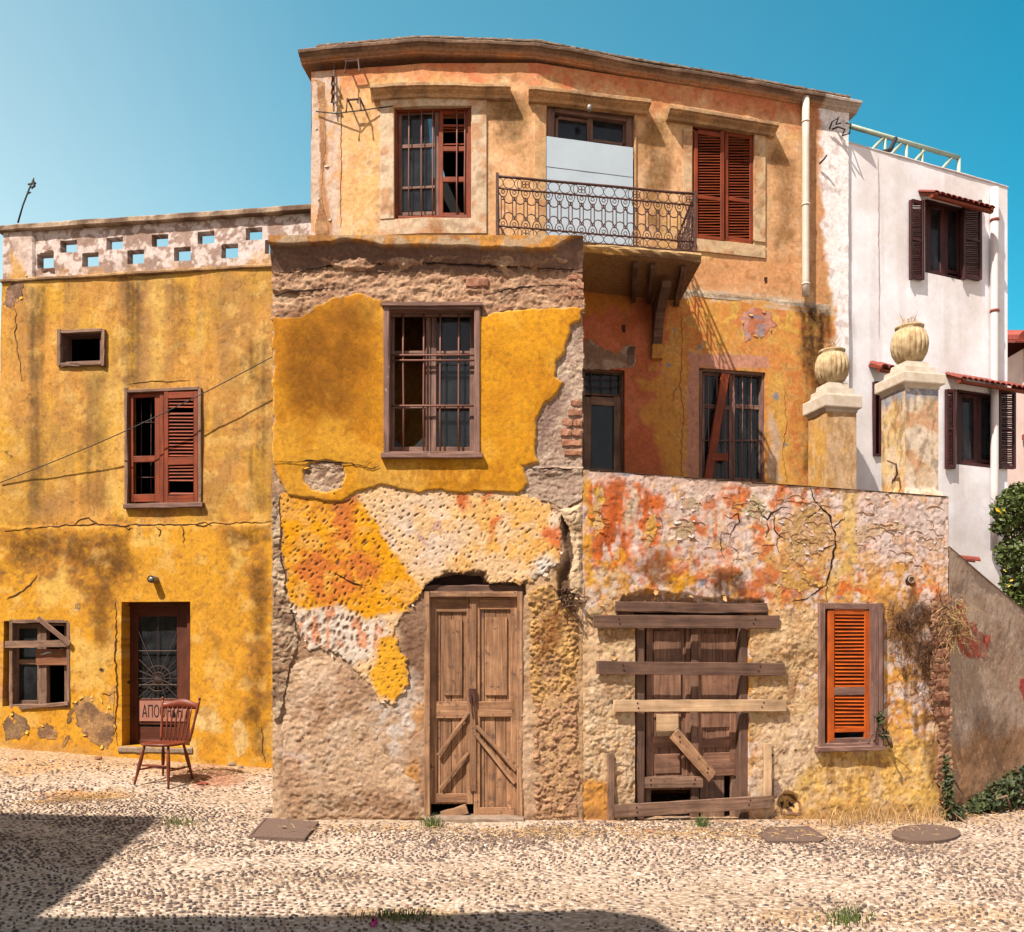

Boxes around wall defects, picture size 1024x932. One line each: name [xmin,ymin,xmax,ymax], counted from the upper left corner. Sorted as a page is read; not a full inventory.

crack [12,298,22,378]
peeling [741,306,777,342]
leakage [797,305,827,389]
crack [8,517,269,543]
spalling [271,254,637,720]
peeling [640,494,840,592]
crack [720,387,845,601]
peeling [854,493,948,567]
spalling [2,686,115,749]